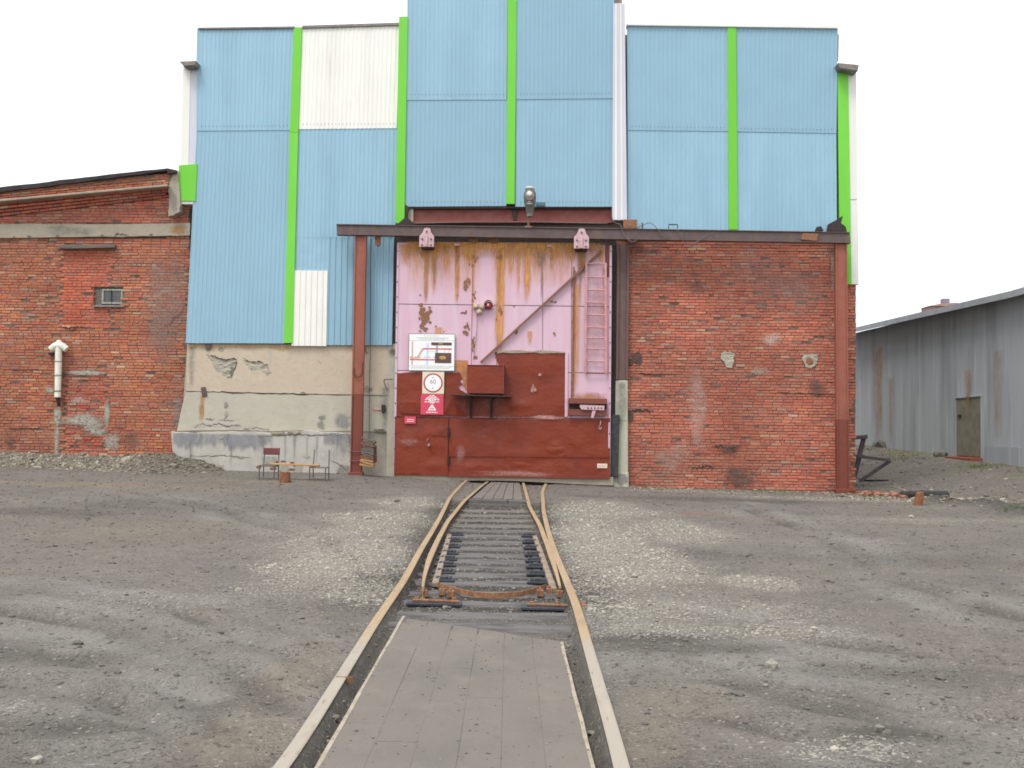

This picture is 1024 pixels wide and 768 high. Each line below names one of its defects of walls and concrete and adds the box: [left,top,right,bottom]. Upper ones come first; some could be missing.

water stain [174,433,267,449]
flaking render [208,347,271,379]
crack [186,355,347,459]
rust [402,242,604,399]